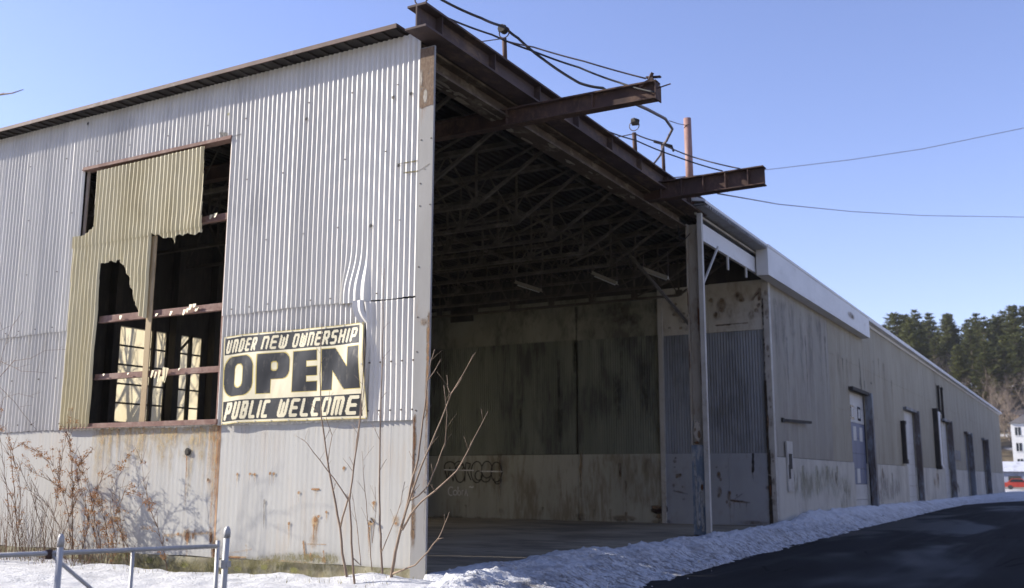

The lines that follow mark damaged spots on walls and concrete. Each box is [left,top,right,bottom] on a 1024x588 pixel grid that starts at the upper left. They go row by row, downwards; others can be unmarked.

corrosion [99,424,219,505]
corrosion [164,530,216,557]